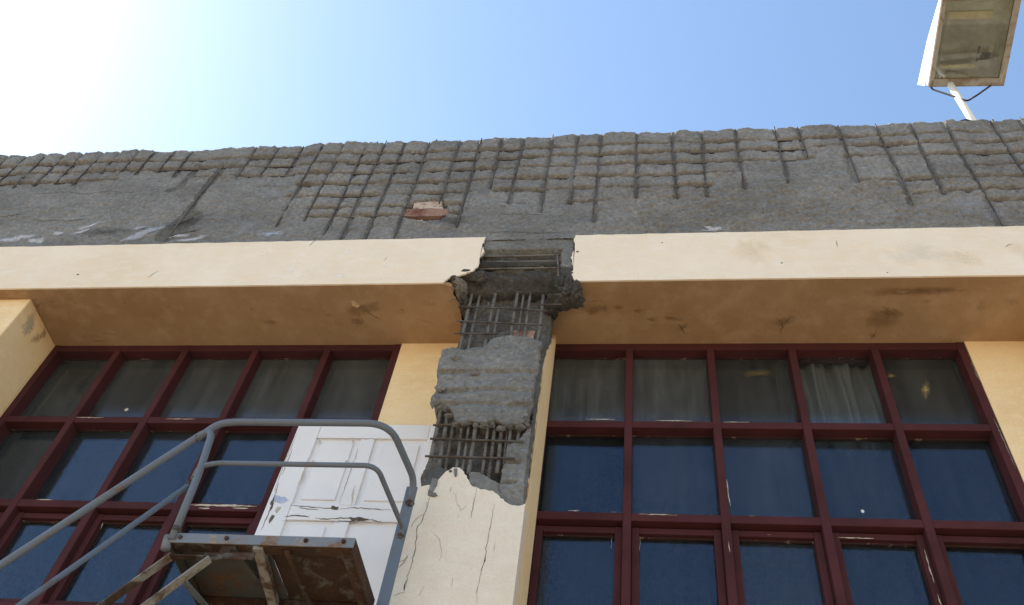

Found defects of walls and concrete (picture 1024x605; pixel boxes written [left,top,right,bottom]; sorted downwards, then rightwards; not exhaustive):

spalling [0,117,1024,240]
spalling [421,238,585,505]
crack [394,486,495,596]